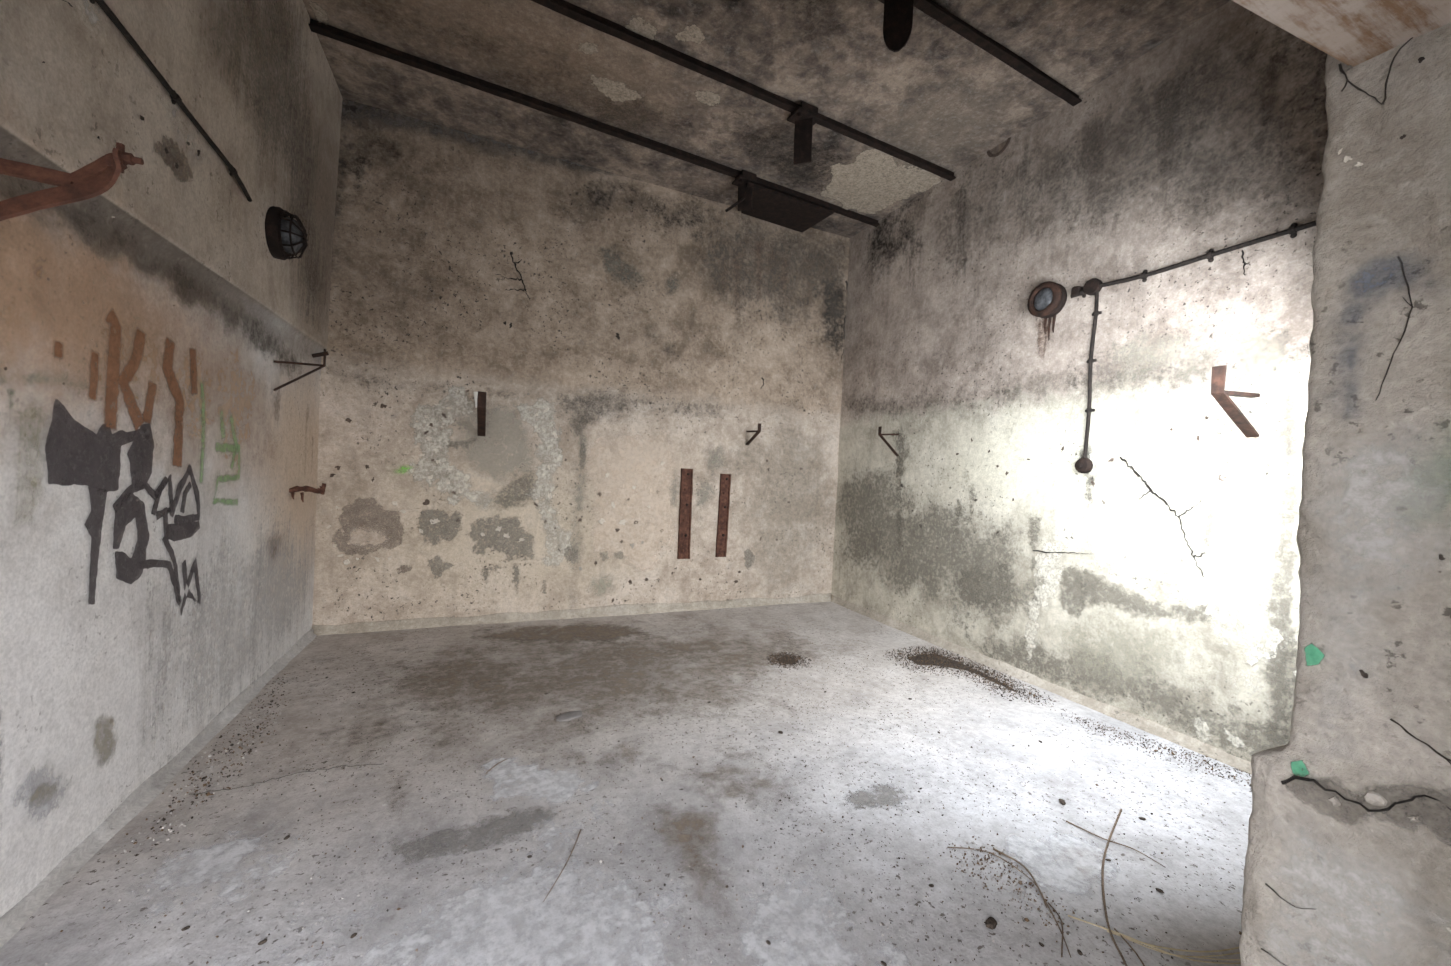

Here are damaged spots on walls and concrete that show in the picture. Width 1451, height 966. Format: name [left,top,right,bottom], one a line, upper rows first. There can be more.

peeling [326,386,644,585]
leakage [839,393,1302,755]
crack [1120,456,1207,577]
crack [1390,718,1451,764]
crack [1265,883,1316,909]